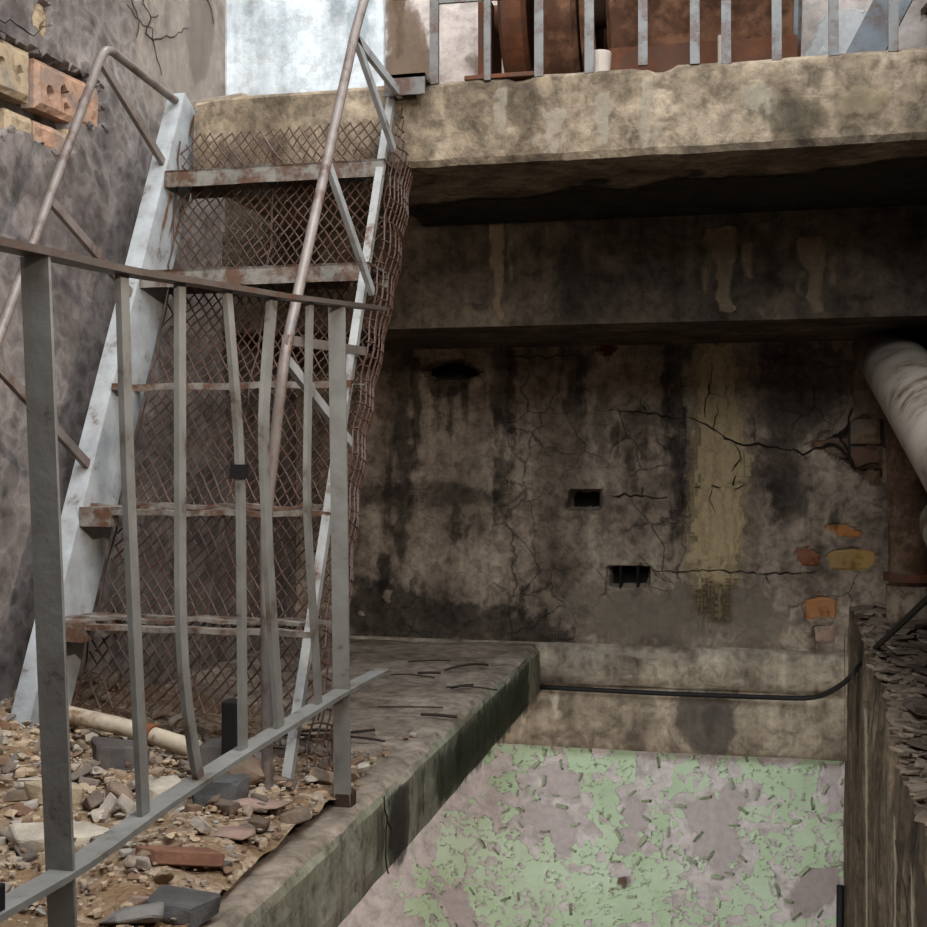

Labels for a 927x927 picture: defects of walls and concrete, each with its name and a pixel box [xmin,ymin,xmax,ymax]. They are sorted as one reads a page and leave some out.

flaking render [32,3,46,36]
flaking render [0,31,109,156]
crack [127,0,189,75]
water stain [349,343,789,646]
crack [603,362,879,513]
crack [658,569,815,584]
flaking render [805,597,837,643]
peeling [393,743,844,927]